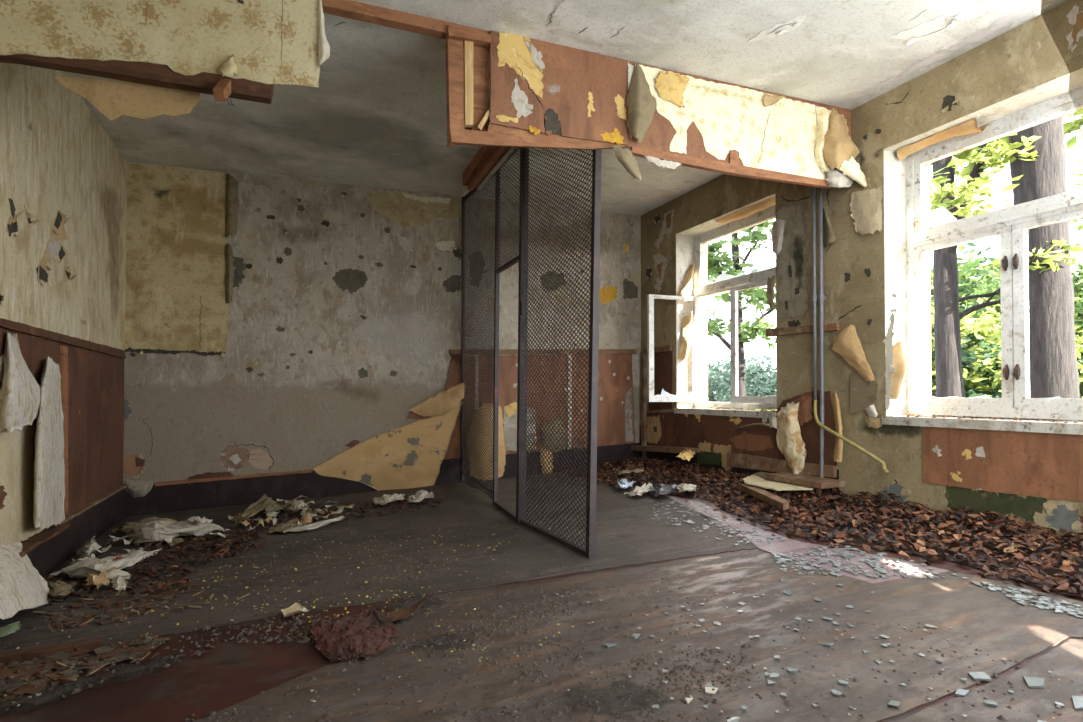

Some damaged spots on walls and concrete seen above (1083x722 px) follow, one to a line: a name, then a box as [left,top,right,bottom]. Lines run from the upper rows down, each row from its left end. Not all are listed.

spalling [511,96,561,136]
peeling [233,256,252,287]
spalling [276,247,292,265]
peeling [324,255,383,295]